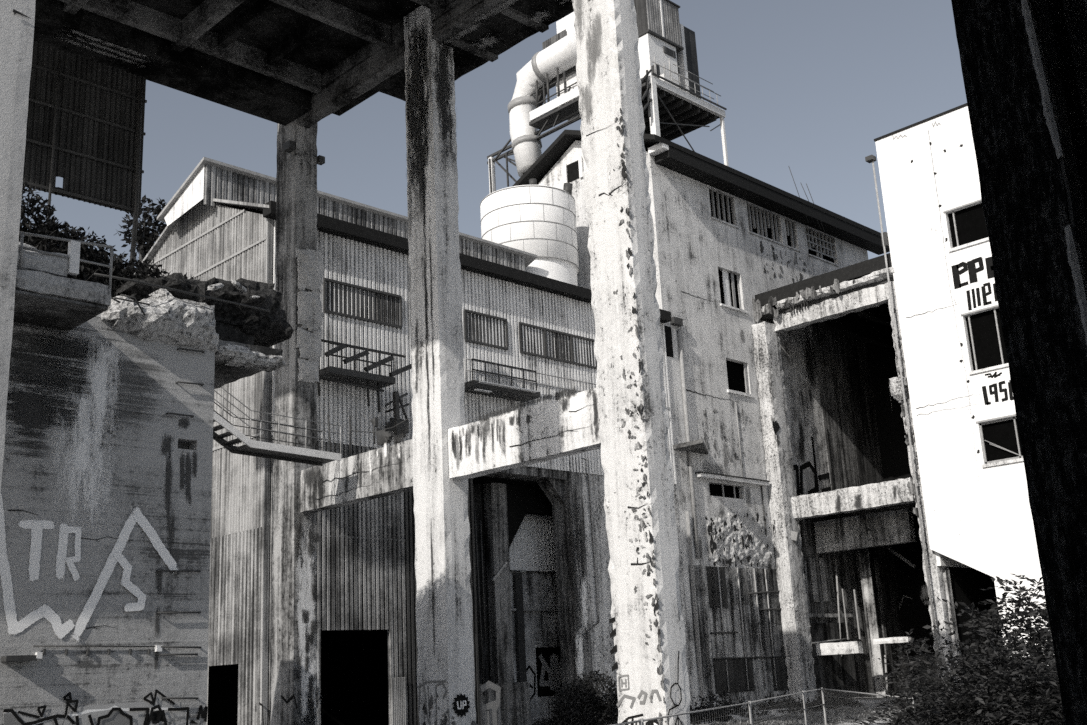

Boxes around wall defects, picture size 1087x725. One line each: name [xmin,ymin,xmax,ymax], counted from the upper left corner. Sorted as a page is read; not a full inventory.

damp [565,0,601,121]
spalling [101,288,286,373]
damp [6,328,151,521]
damp [304,465,325,500]
damp [345,433,403,490]
damp [452,389,576,468]
damp [703,445,728,475]
damp [295,515,321,725]